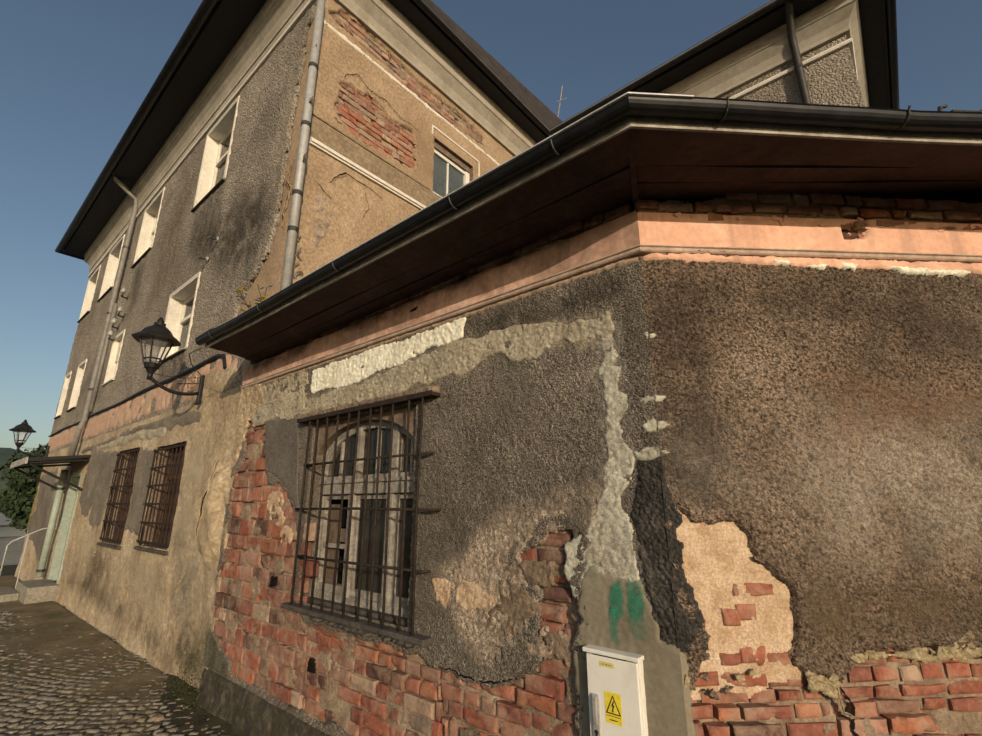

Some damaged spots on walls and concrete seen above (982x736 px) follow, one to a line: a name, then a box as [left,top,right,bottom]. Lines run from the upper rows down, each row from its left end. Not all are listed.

flaking render [334,84,420,170]
flaking render [48,193,982,451]
flaking render [211,416,582,736]
flaking render [663,501,982,736]
crack [826,676,860,736]